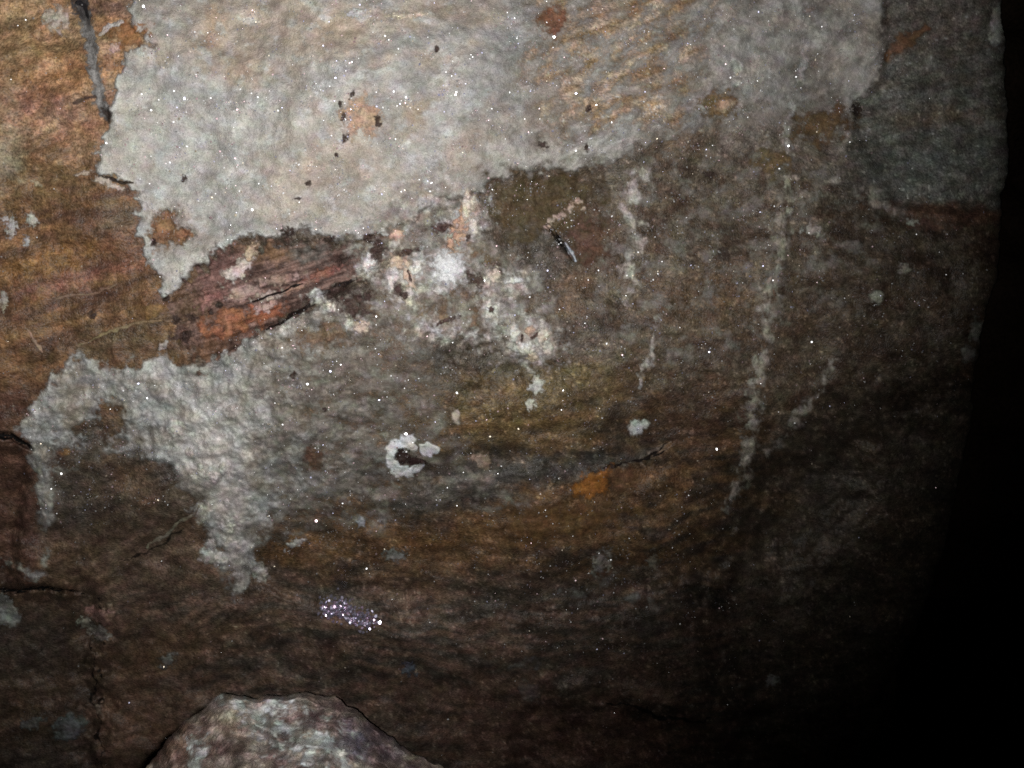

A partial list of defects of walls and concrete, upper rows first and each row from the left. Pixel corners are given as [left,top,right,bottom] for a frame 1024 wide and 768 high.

damp [855,186,898,215]
spalling [162,226,374,376]
damp [16,0,888,602]
damp [6,550,48,582]